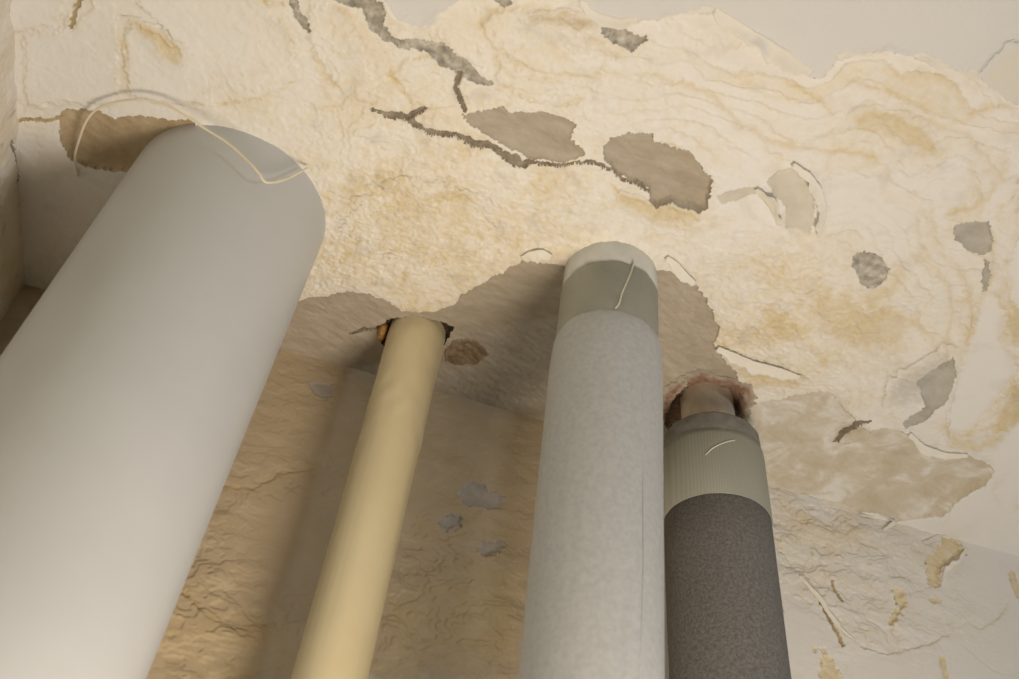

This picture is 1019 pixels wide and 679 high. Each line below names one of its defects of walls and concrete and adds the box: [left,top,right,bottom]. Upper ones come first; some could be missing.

crack [68,0,83,29]
spalling [335,0,494,86]
spalling [601,27,649,53]
crack [370,70,650,193]
peeling [520,250,553,264]
spalling [851,250,890,289]
spalling [953,221,994,255]
peeling [716,347,801,381]
corrosion [663,370,758,431]
peeling [182,349,377,624]
peeling [390,390,544,584]
peeling [768,484,968,657]